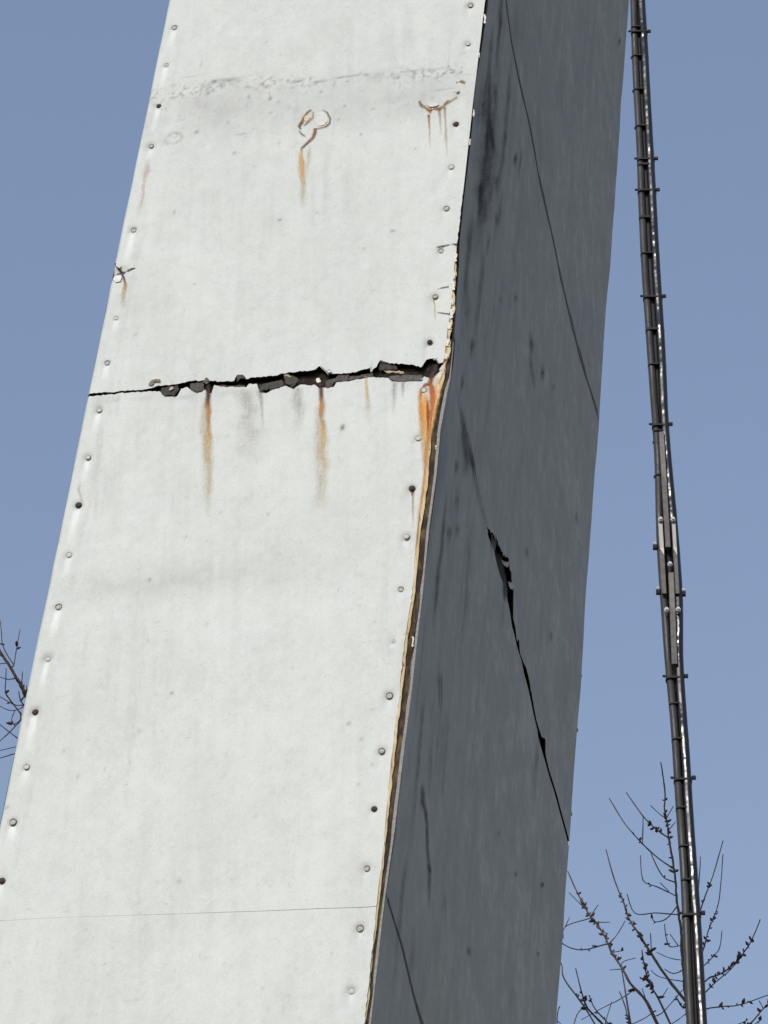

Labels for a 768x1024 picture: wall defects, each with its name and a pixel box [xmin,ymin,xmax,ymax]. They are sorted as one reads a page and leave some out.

corrosion [418,80,465,139]
corrosion [298,110,331,194]
crack [92,356,445,397]
corrosion [203,383,211,492]
corrosion [317,382,326,483]
crack [488,534,515,600]
corrosion [365,262,457,1024]